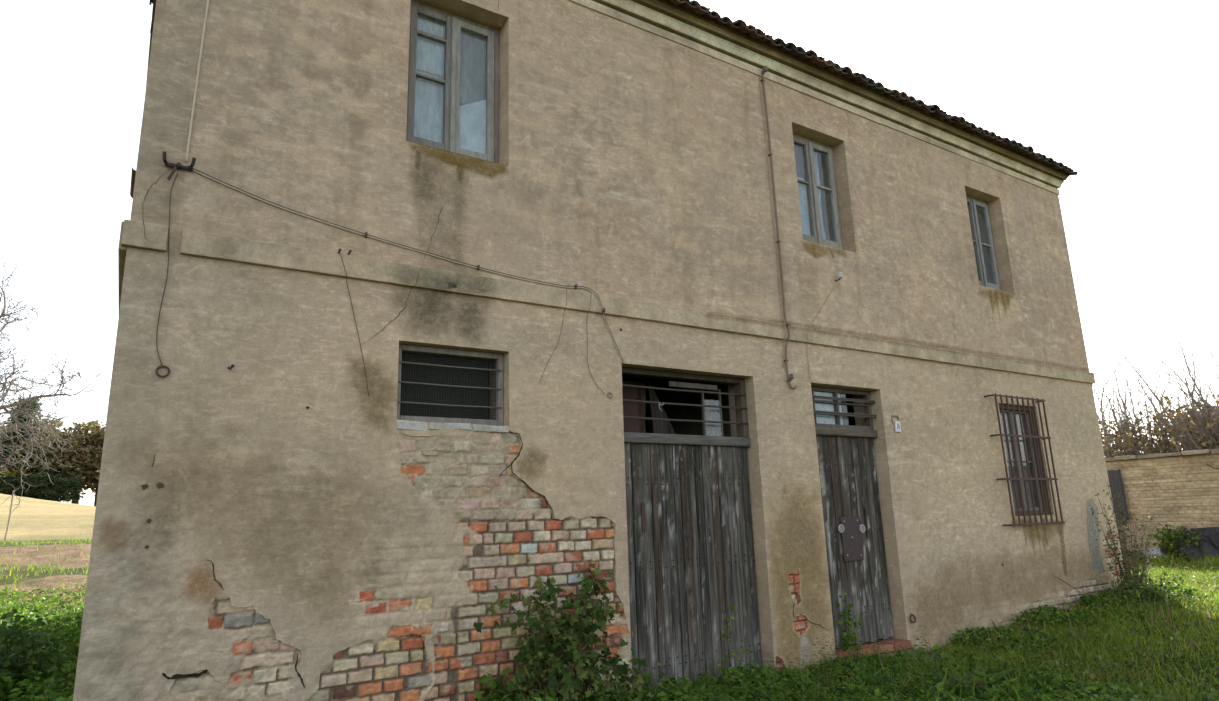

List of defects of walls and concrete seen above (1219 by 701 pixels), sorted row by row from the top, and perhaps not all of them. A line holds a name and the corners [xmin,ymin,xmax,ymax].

flaking render [141,428,631,701]
flaking render [788,570,810,662]